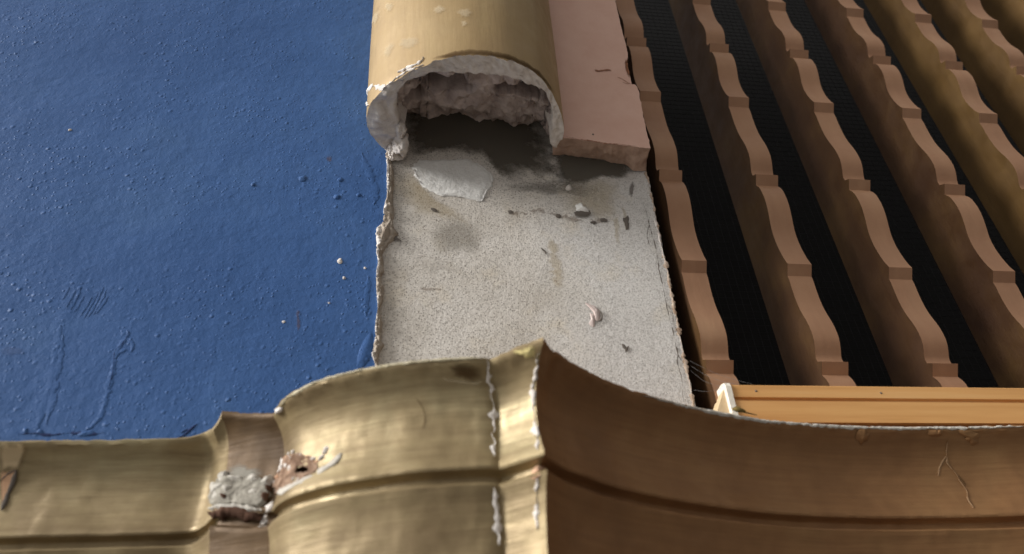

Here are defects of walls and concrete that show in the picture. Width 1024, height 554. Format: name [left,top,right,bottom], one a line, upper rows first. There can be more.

spalling [365,51,631,202]
spalling [574,203,591,217]
spalling [206,446,342,528]
crack [938,440,974,508]